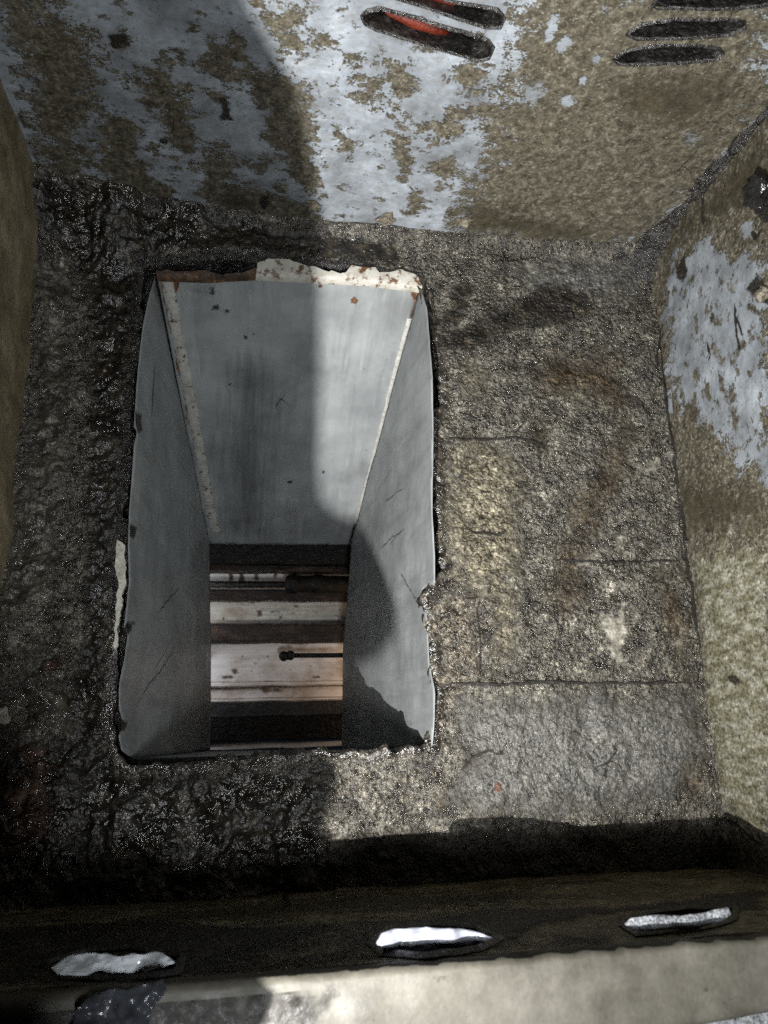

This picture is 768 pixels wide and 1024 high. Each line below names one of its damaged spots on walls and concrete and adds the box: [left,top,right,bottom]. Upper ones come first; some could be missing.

peeling [0,0,768,491]
leakage [0,168,768,906]